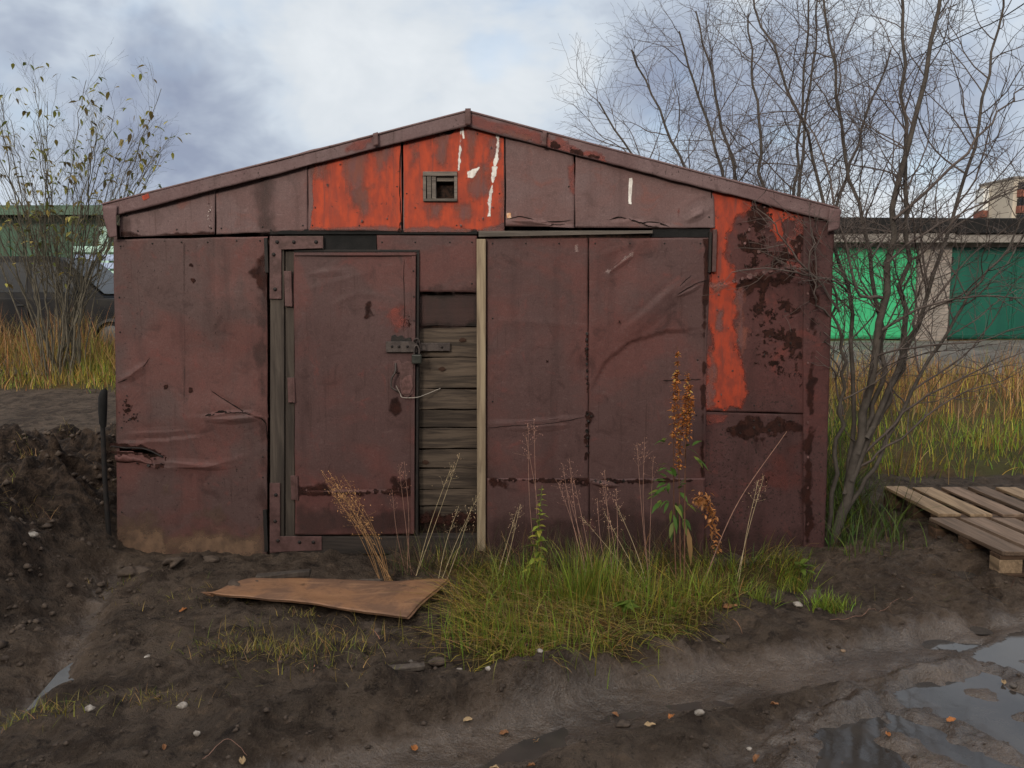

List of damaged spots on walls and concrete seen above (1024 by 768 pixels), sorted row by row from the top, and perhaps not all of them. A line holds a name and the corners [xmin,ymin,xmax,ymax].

rust [489,441,705,488]
peeling [705,191,803,423]
rust [726,204,819,543]